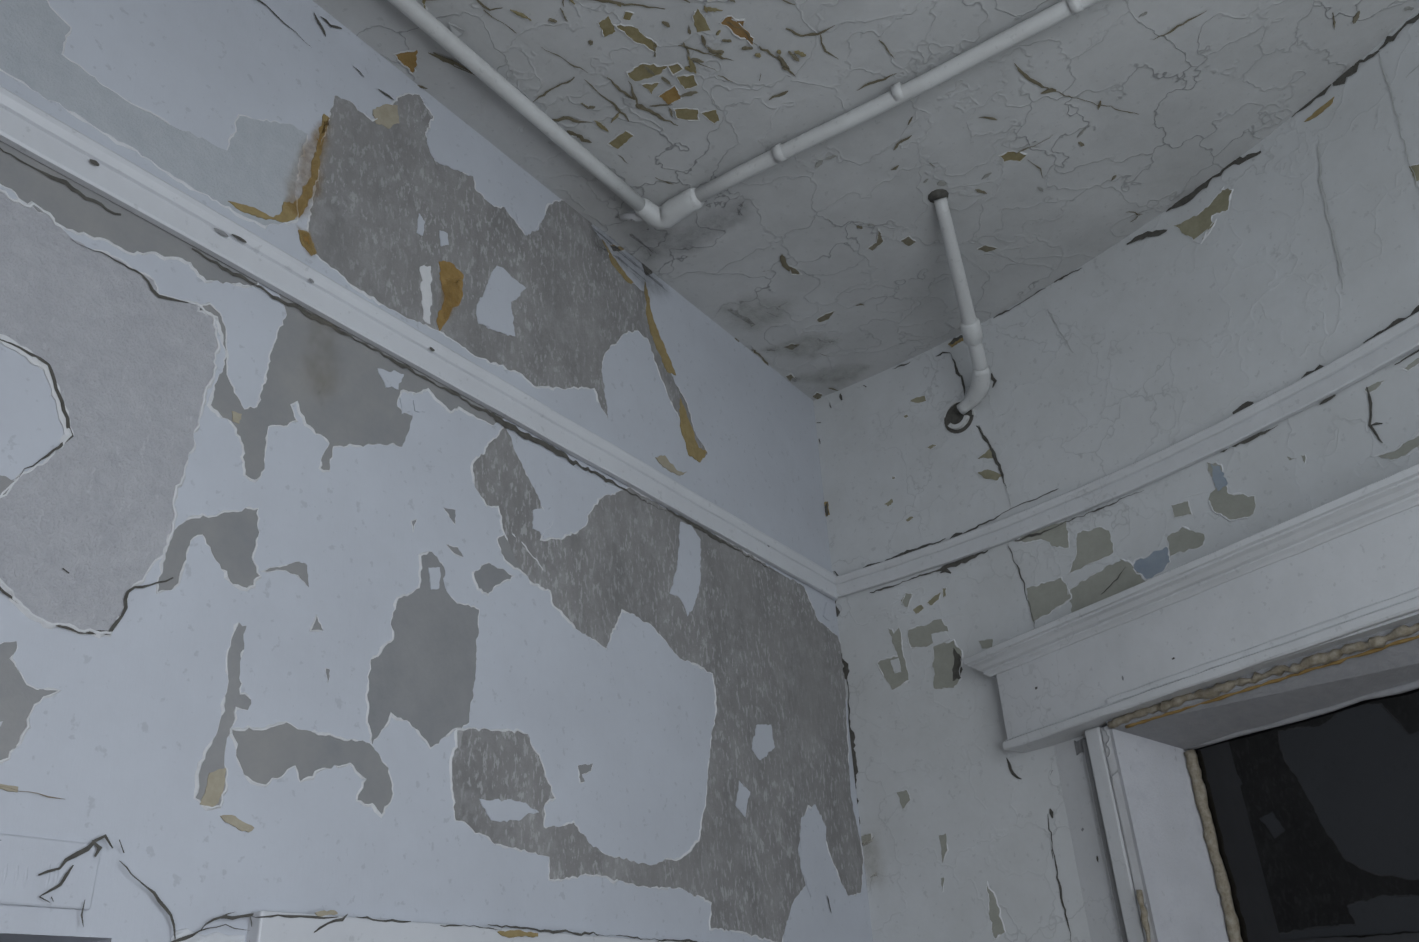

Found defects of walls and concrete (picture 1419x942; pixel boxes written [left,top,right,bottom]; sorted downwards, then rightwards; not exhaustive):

peeling [533,0,838,163]
peeling [0,0,708,476]
crack [1127,151,1261,245]
crack [1292,13,1419,289]
spalling [944,402,974,433]
crack [1221,401,1278,452]
crack [1302,364,1336,405]
crack [1363,305,1419,365]
peeling [0,140,872,942]
peeling [1008,501,1205,628]
peeling [877,588,963,690]
crack [38,834,697,942]